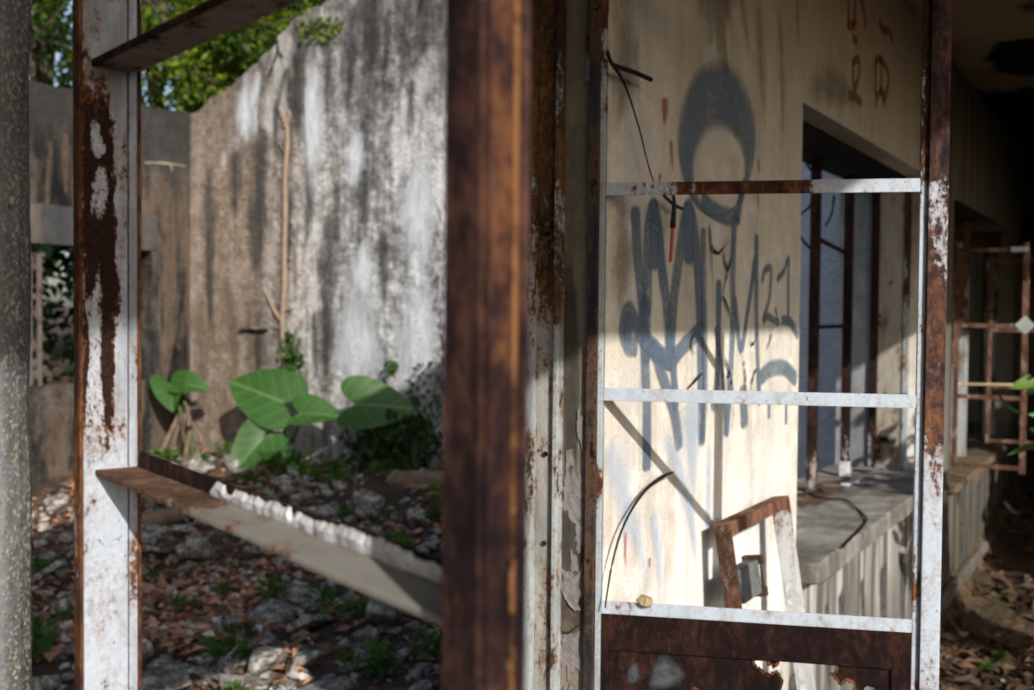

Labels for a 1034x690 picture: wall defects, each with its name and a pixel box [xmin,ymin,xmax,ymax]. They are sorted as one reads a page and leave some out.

damp [347,0,390,99]
corrosion [79,75,122,456]
damp [205,179,213,315]
damp [232,154,240,206]
damp [237,42,329,267]
damp [312,220,388,376]
damp [346,133,368,223]
efflorescence [399,163,433,262]
damp [398,286,435,396]
peeling [560,409,584,690]